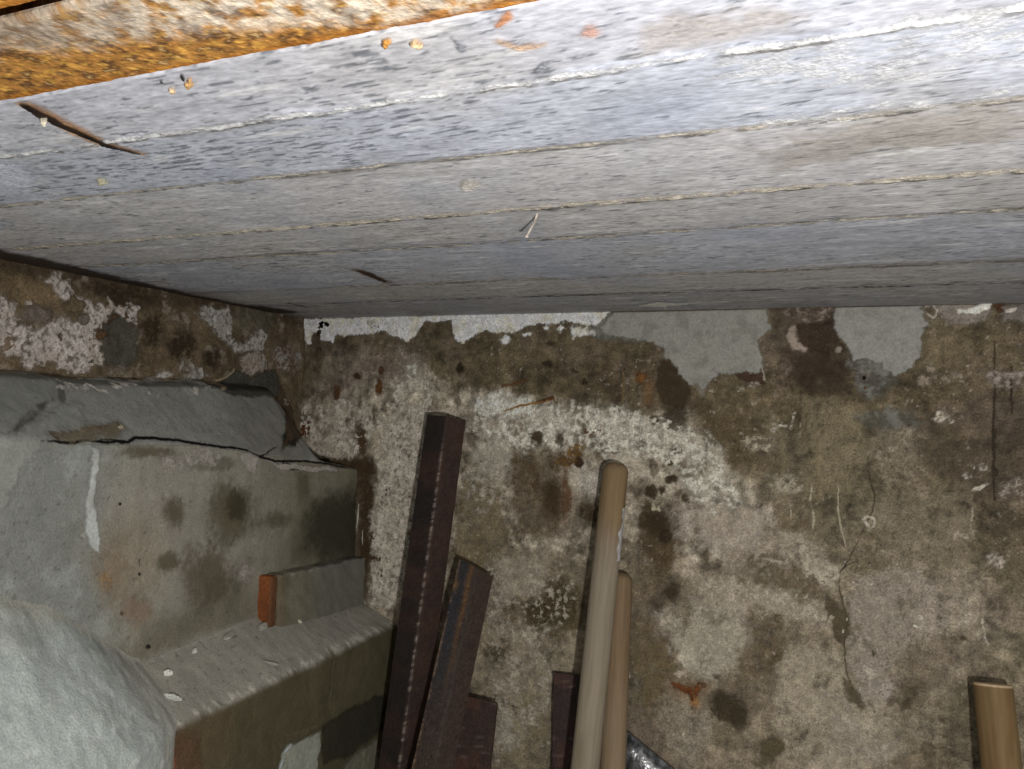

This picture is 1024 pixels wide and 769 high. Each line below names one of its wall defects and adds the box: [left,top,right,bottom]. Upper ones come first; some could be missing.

damp [0,250,297,314]
damp [65,296,90,326]
damp [797,320,897,399]
damp [918,365,964,386]
damp [985,366,1024,410]
crack [13,380,345,470]
damp [212,485,252,541]
crack [839,447,884,610]
damp [159,552,178,568]
damp [466,360,924,767]
damp [986,554,1005,569]
rust [672,682,706,705]